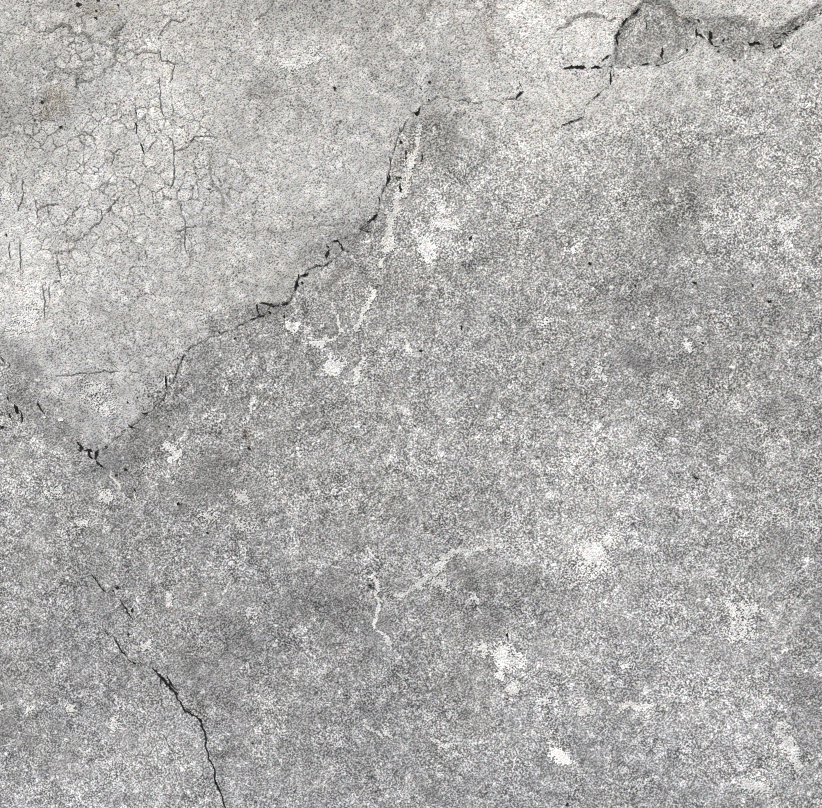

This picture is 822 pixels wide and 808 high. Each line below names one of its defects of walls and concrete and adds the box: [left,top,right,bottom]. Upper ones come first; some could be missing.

crack [561,8,822,126]
crack [0,0,523,499]
crack [91,571,226,808]